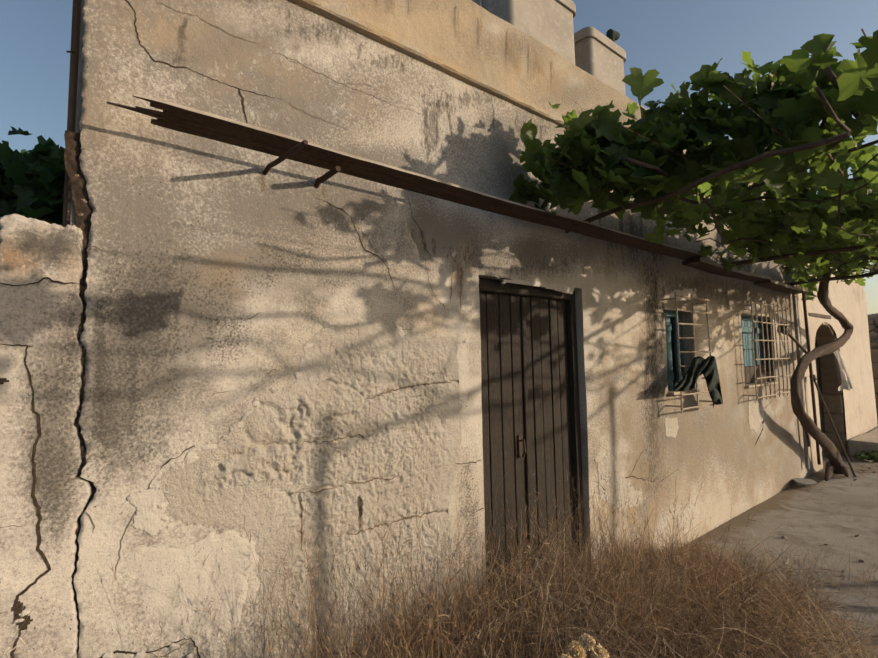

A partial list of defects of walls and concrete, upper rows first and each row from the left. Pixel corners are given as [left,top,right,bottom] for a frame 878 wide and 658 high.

crack [126,0,420,132]
crack [318,199,397,299]
crack [408,197,446,313]
crack [0,130,100,658]
crack [115,510,137,579]
crack [147,445,195,490]
flaking render [127,320,470,658]
crack [99,638,201,658]